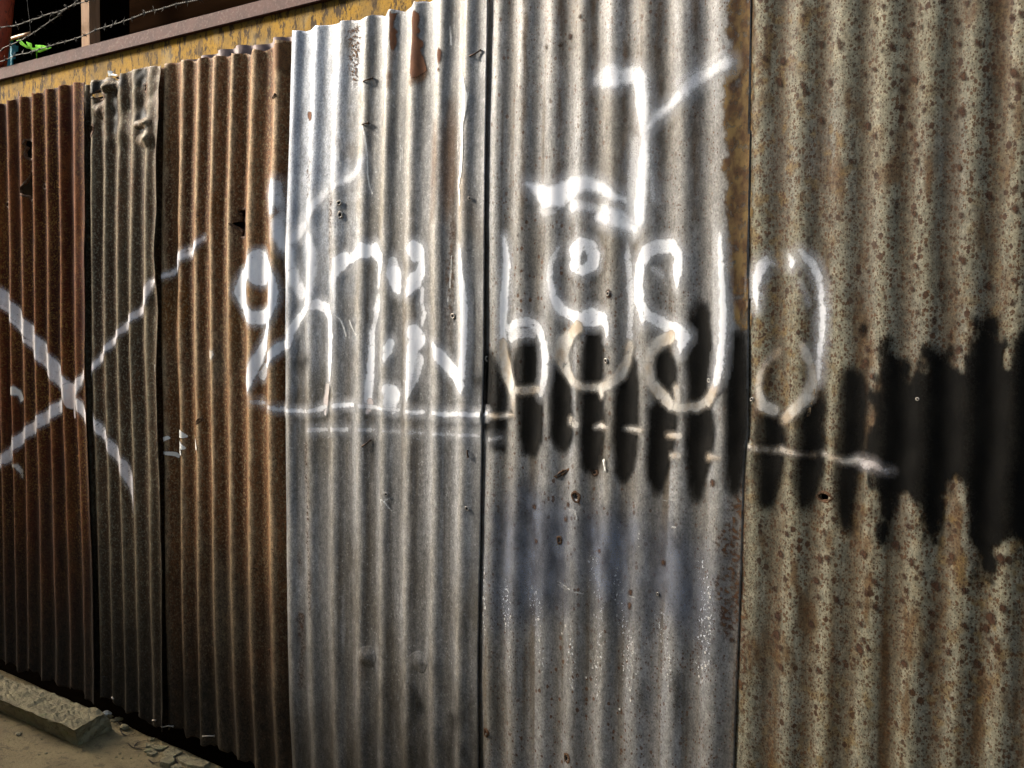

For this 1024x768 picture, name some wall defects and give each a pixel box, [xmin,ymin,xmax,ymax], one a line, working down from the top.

rust [389,11,398,51]
rust [410,10,441,84]
rust [720,0,786,330]
rust [715,476,748,693]
rust [900,558,939,618]
rust [856,621,870,655]
rust [981,604,1011,653]